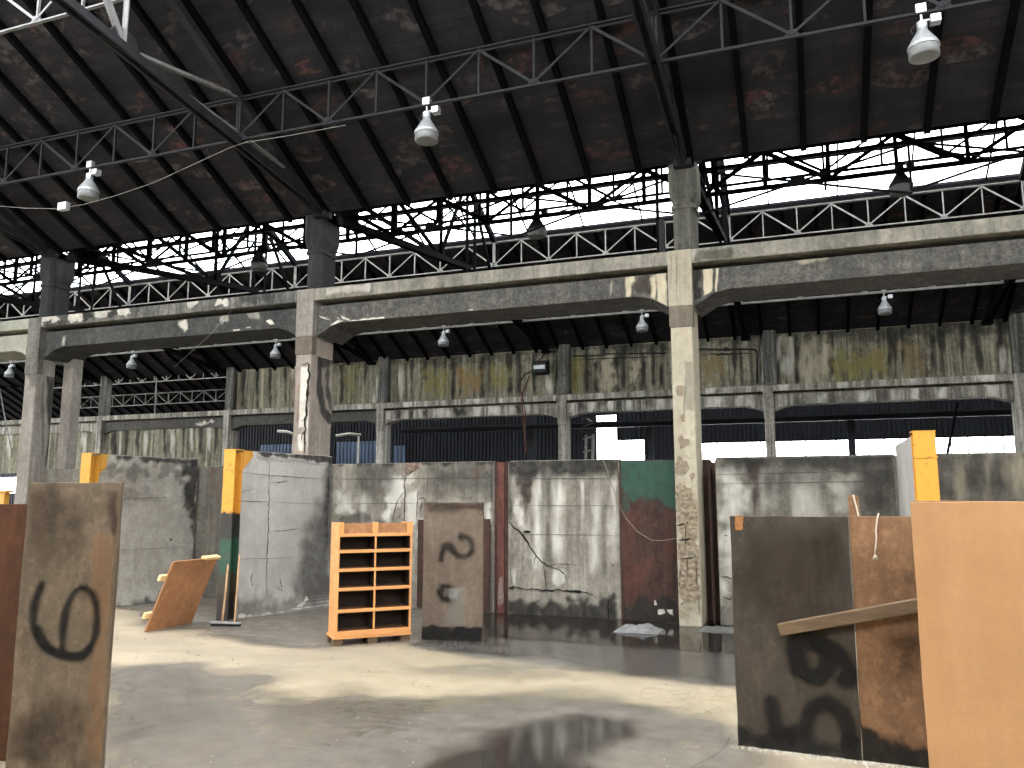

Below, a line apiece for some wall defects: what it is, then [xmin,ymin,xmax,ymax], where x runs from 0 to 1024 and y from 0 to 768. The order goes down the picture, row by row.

leakage [315,355,558,426]
leakage [568,352,667,413]
leakage [682,344,754,416]
leakage [759,335,1013,404]
crack [237,362,317,591]
crack [392,471,425,525]
crack [487,472,612,619]
leakage [508,464,679,622]
corrosion [621,485,676,606]
spalling [621,413,702,619]